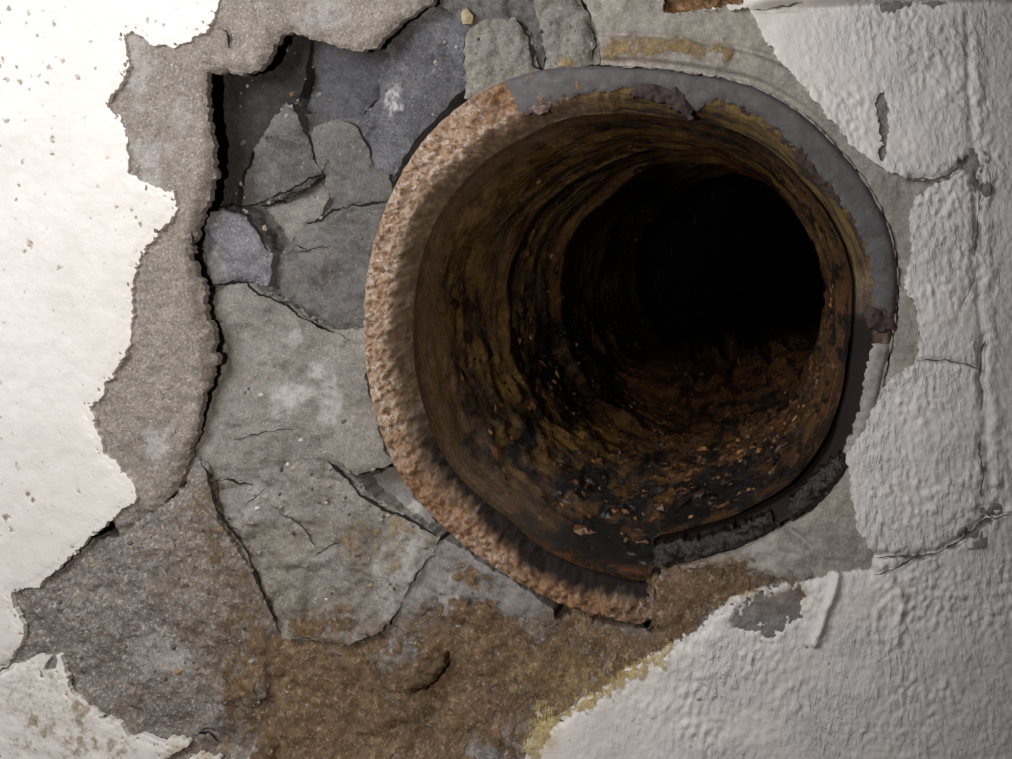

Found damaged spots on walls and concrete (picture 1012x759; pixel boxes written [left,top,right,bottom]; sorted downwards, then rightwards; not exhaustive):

spalling [664,0,743,14]
peeling [629,83,697,121]
peeling [872,92,890,170]
crack [218,163,387,254]
crack [191,231,348,340]
spalling [11,0,679,759]
crack [921,336,986,411]
crack [200,460,279,631]
crack [328,462,437,537]
peeling [646,450,848,638]
crack [875,439,1011,575]
corrosion [197,527,795,759]